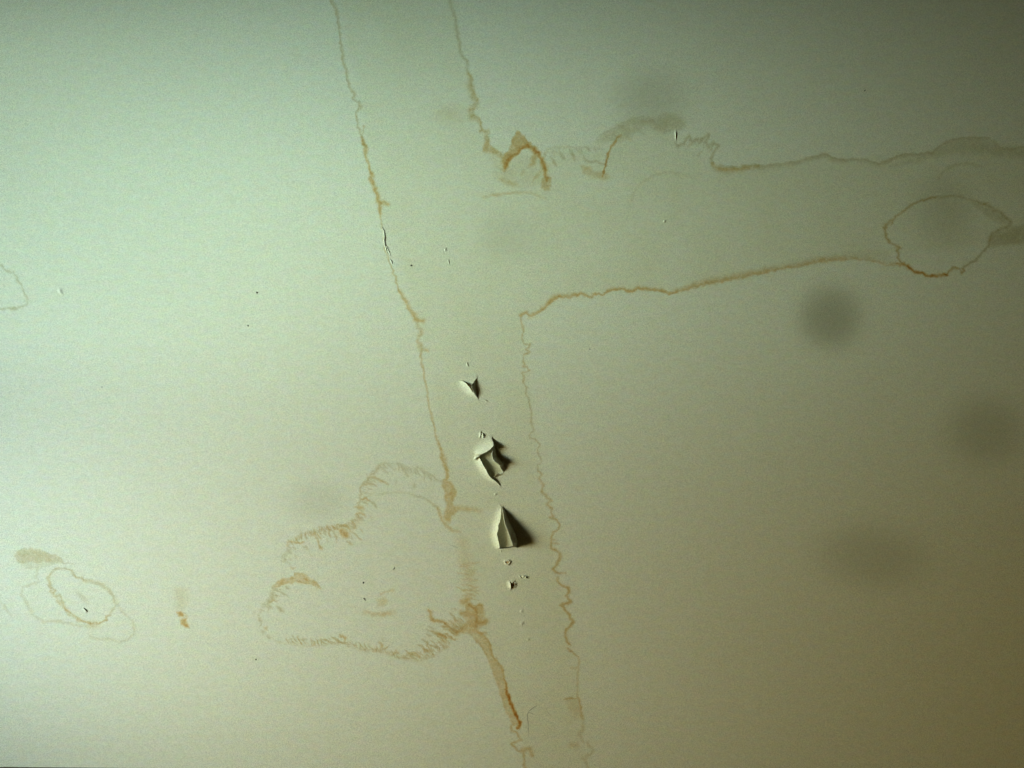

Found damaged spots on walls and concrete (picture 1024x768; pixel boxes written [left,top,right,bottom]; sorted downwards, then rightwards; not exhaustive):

leakage [251,0,547,768]
peeling [454,372,478,401]
peeling [470,431,505,488]
leakage [517,59,1024,768]
peeling [486,501,518,554]
leakage [13,546,137,645]